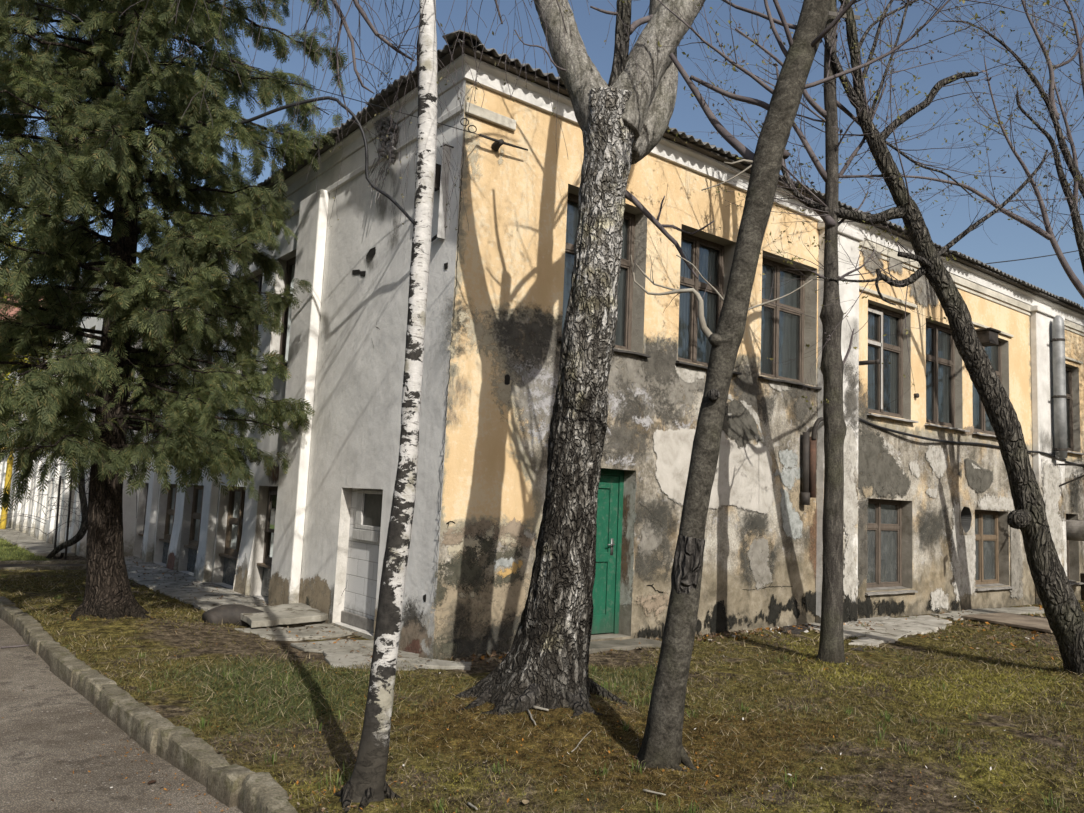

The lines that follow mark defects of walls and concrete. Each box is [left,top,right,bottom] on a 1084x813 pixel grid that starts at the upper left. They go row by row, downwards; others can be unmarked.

leakage [489,306,561,447]
flaking render [675,366,706,384]
flaking render [723,393,766,449]
peeling [773,449,803,540]
flaking render [843,424,921,601]
flaking render [958,458,993,493]
leakage [401,529,524,656]